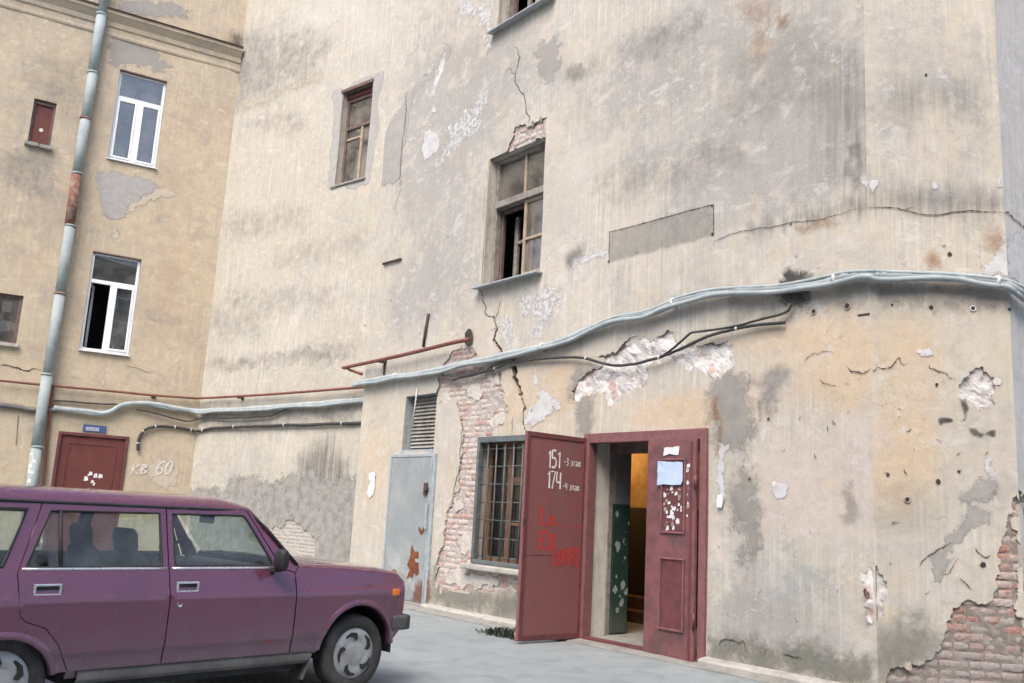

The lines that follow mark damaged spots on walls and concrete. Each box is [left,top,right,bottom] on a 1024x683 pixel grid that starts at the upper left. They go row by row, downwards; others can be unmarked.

crack [713,207,1024,242]
crack [481,290,527,431]
flaking render [574,331,735,408]
water stain [706,370,787,450]
crack [806,351,973,387]
flaking render [958,367,1001,411]
flaking render [436,329,518,593]
flaking render [188,465,357,562]
water stain [730,470,763,561]
peeling [924,451,998,595]
rust [392,546,430,603]
flaking render [886,493,1024,683]